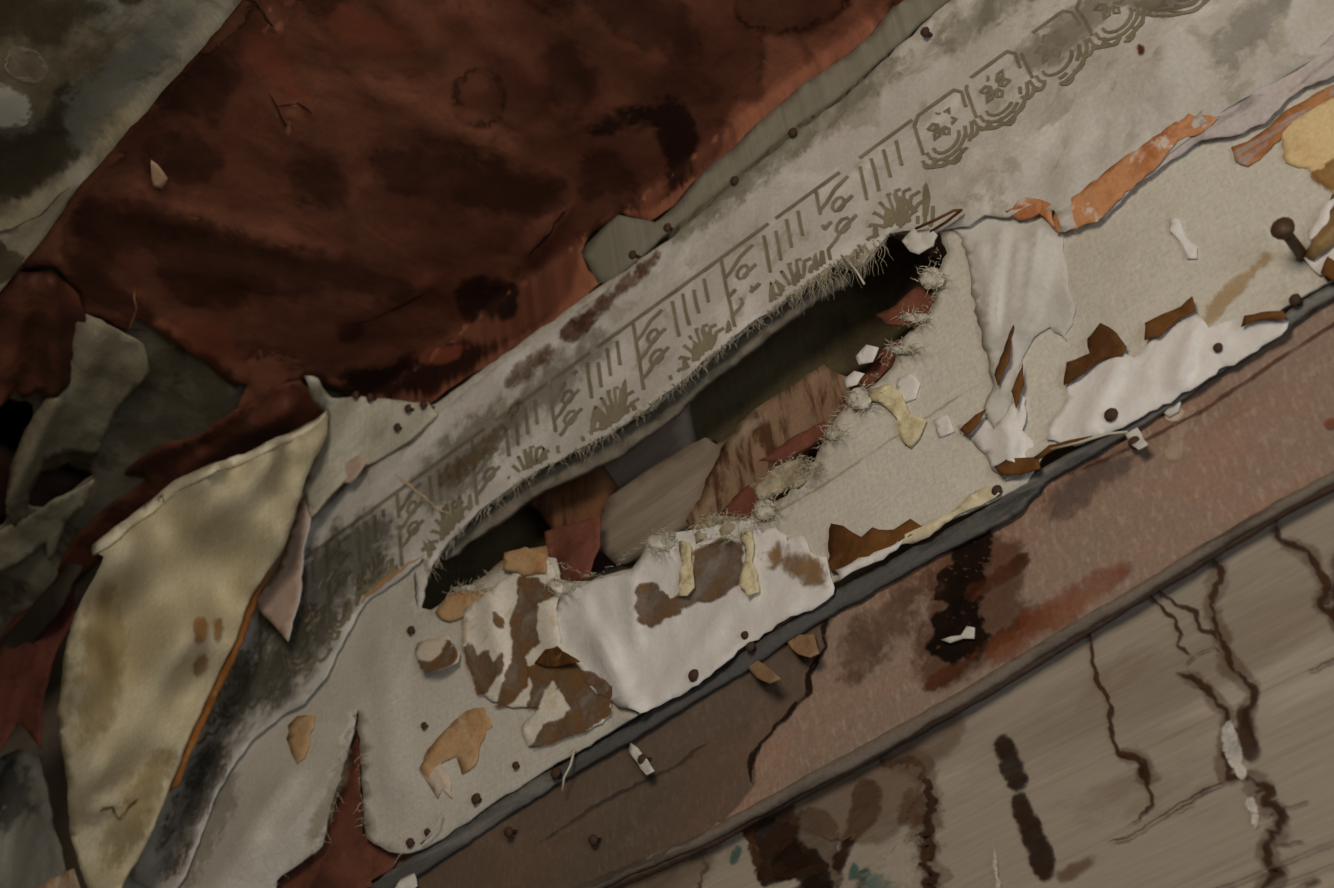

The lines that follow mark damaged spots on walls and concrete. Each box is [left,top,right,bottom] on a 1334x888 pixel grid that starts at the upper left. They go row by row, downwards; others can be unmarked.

damp [0,0,99,202]
damp [138,0,259,183]
rust [560,251,660,342]
peeling [415,33,1334,799]
damp [463,576,612,747]
damp [635,537,743,627]
damp [768,542,824,585]
damp [848,536,1025,687]
damp [1274,521,1334,622]
damp [420,617,940,888]
crack [1109,781,1224,842]